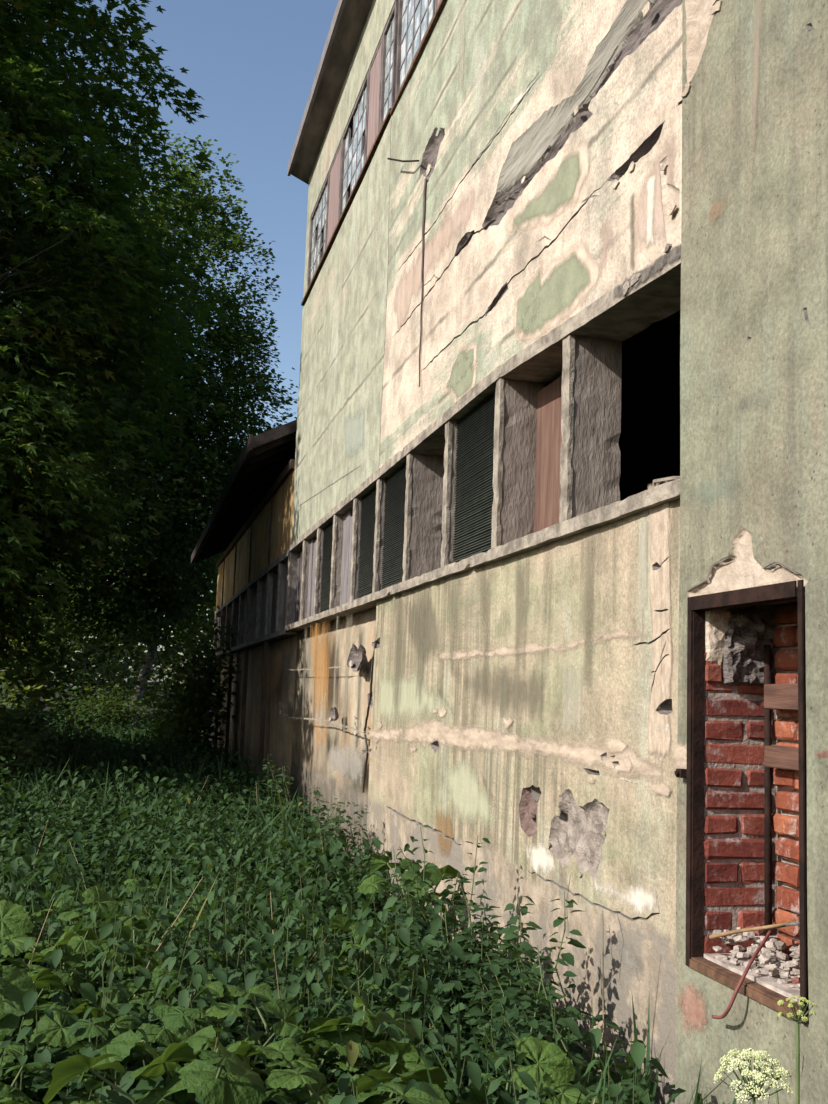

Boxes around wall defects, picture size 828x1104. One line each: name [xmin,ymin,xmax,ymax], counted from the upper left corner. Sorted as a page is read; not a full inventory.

flaking render [482,0,722,233]
peeling [607,120,681,297]
crack [423,180,607,370]
flaking render [687,525,808,597]
crack [288,584,463,846]
leakage [380,675,447,718]
leakage [409,606,437,656]
leakage [467,672,542,714]
peeling [354,502,687,796]
crack [634,609,671,693]
flaking render [519,785,610,884]
crack [528,871,660,978]